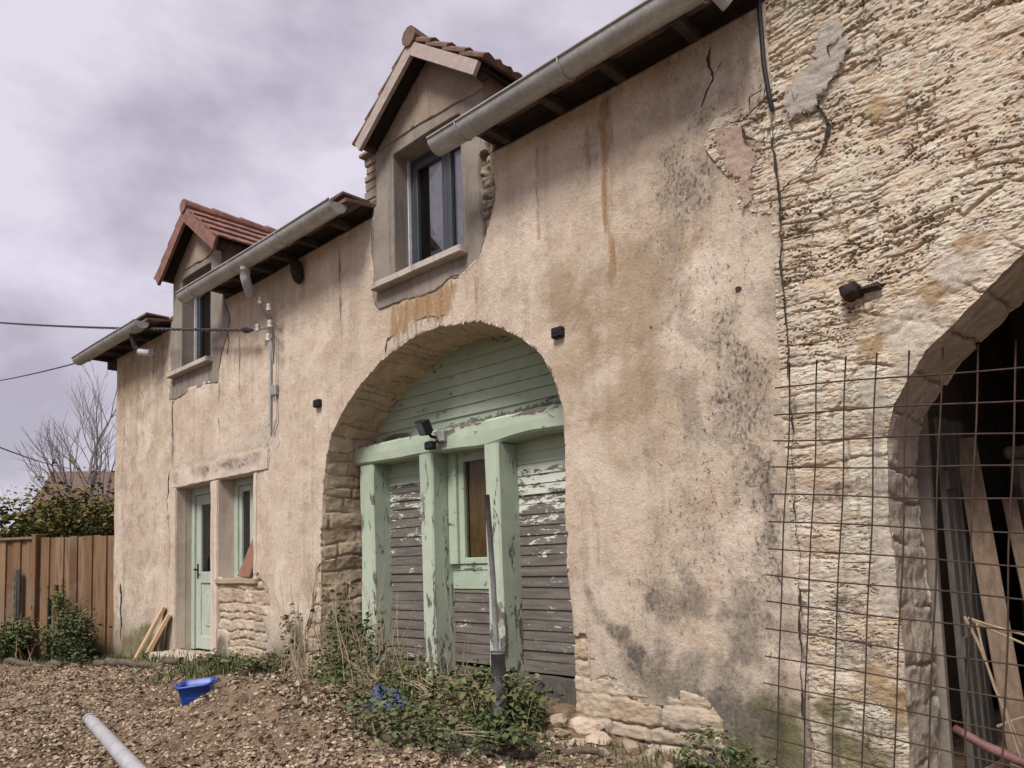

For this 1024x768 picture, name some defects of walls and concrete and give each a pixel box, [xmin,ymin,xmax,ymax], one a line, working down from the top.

crack [701,49,722,107]
spalling [480,144,498,237]
rust [600,98,608,224]
damp [655,145,710,233]
spalling [704,98,772,214]
rust [391,284,452,335]
damp [711,311,782,584]
crack [724,88,851,718]
damp [602,562,788,767]